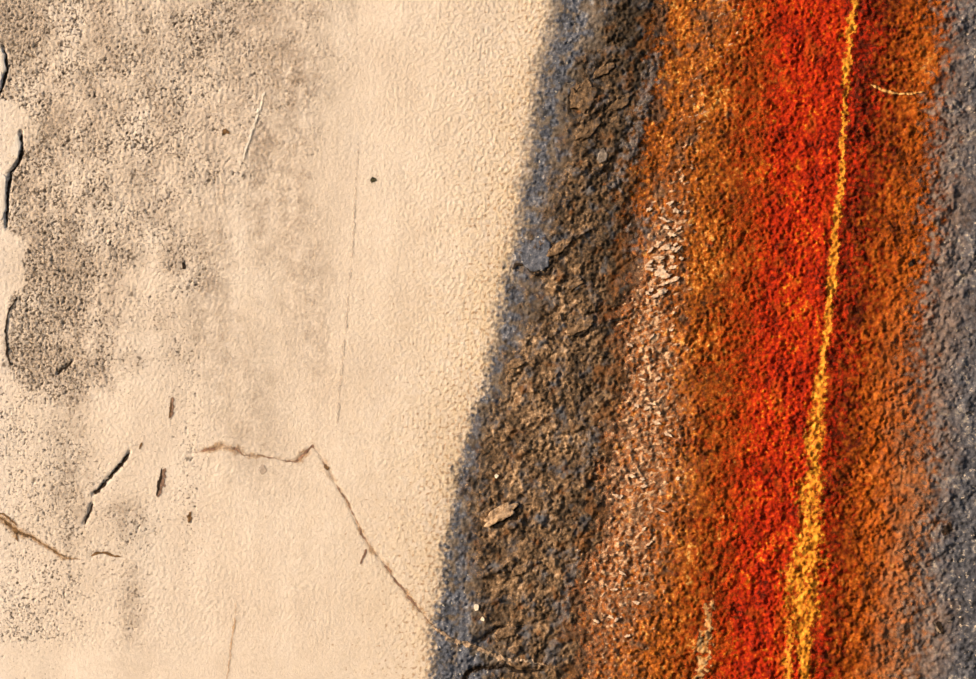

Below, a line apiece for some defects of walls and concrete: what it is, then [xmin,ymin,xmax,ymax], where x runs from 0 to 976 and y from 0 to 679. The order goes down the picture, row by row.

peeling [10,134,22,159]
flaking render [461,0,669,679]
rust [564,0,955,679]
crack [84,443,143,524]
crack [202,443,326,465]
crack [0,513,120,560]
crack [337,486,547,679]